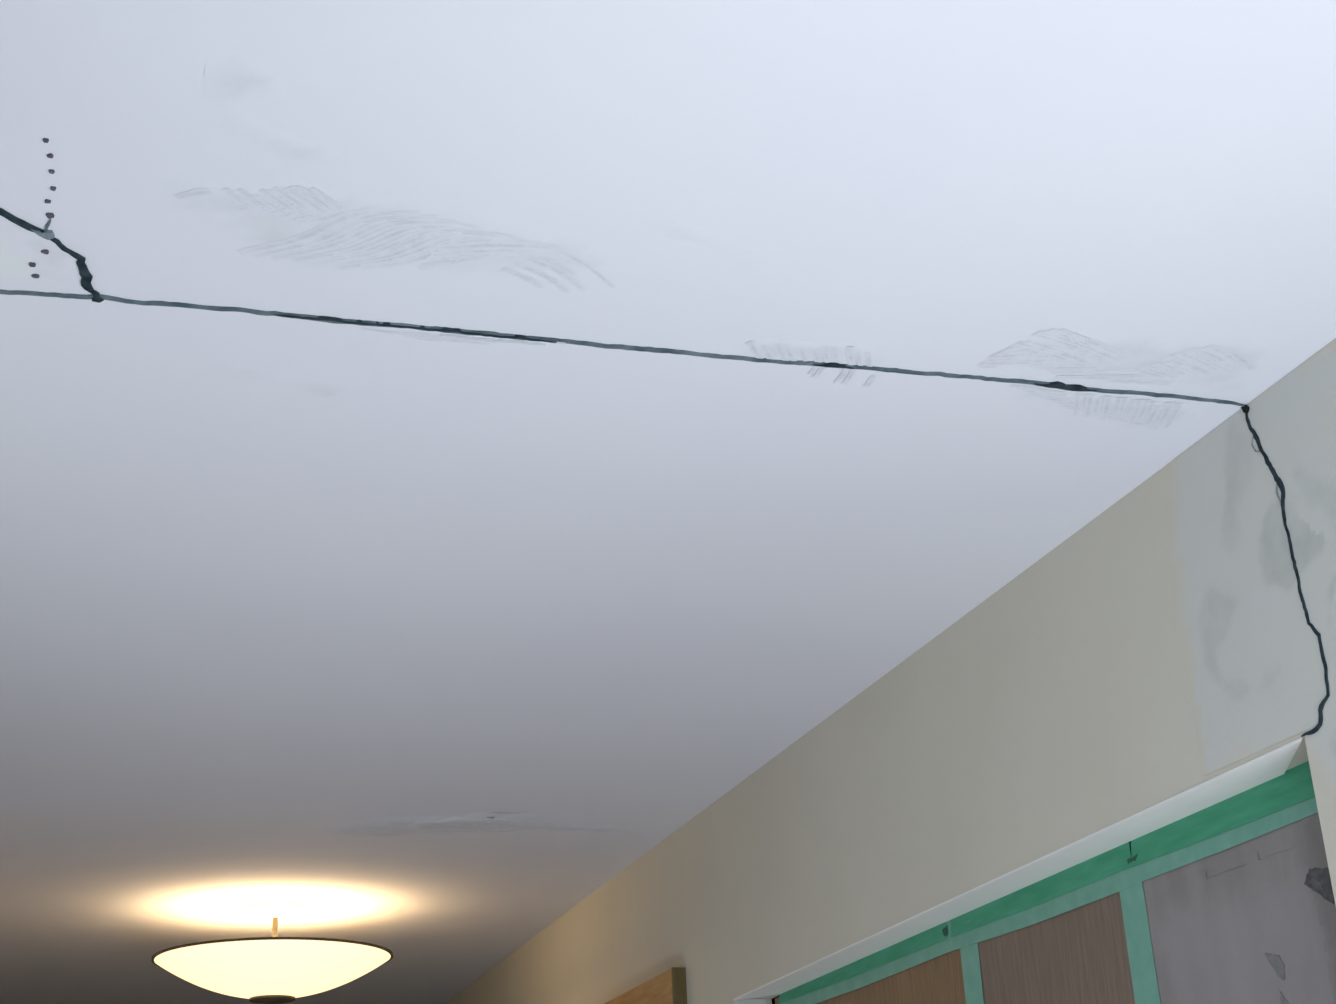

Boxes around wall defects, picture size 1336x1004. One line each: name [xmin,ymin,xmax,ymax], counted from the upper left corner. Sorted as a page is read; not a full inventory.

crack [0,208,1330,737]